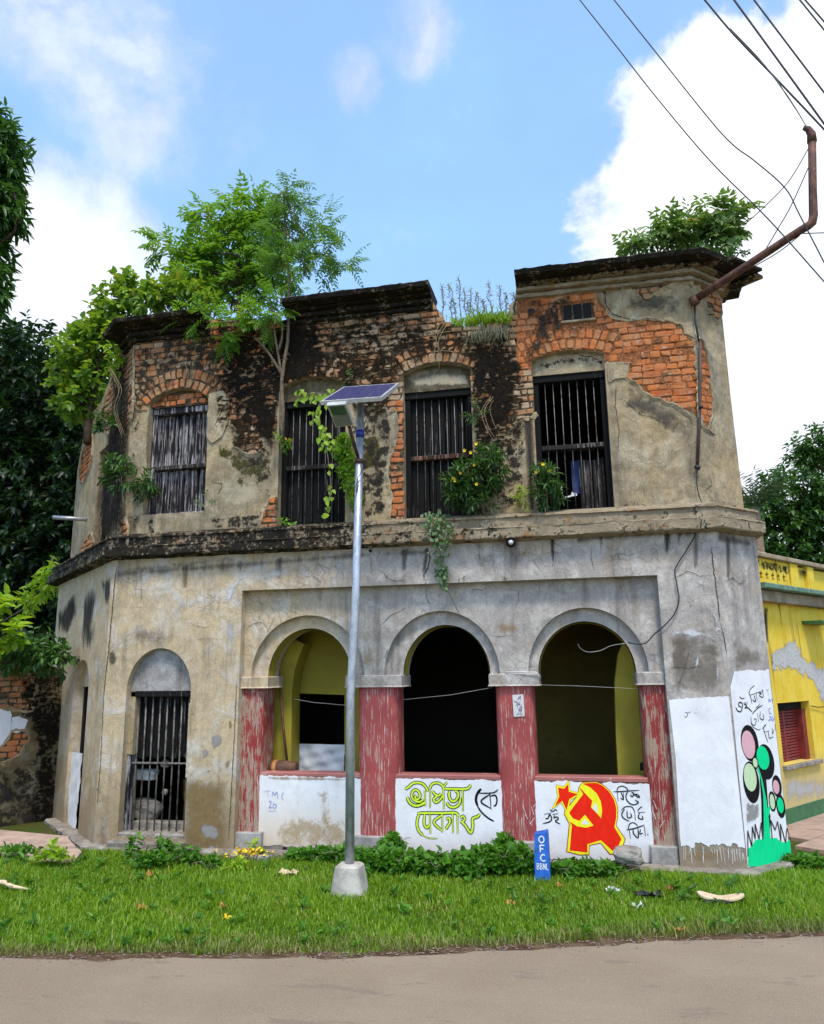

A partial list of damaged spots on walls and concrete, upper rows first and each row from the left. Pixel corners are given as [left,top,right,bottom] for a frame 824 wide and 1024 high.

flaking render [78,290,715,520]
water stain [59,581,110,645]
crack [673,546,744,653]
flaking render [0,659,40,766]
peeling [771,638,824,703]